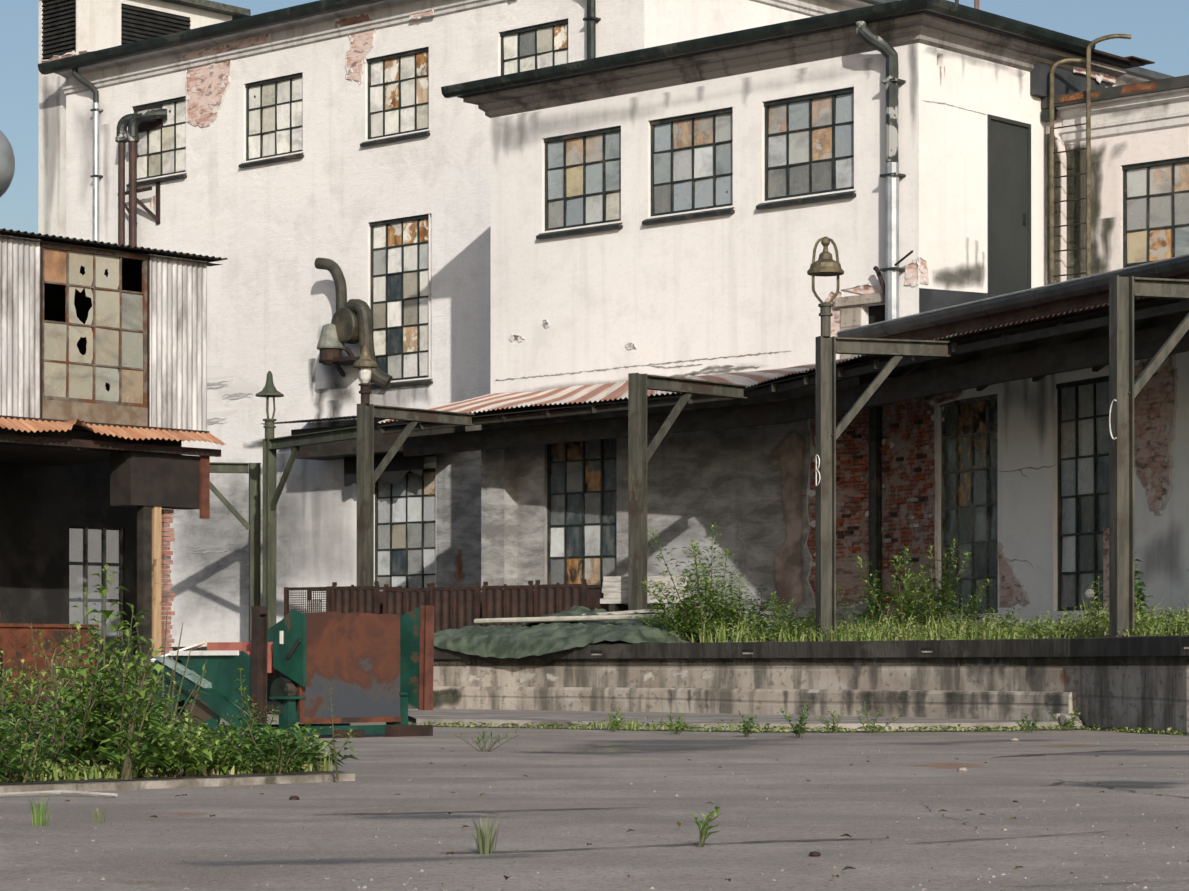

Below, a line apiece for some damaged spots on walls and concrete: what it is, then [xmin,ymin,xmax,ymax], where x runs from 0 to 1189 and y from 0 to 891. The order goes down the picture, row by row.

peeling [183,34,268,128]
peeling [335,14,377,85]
corrosion [1061,92,1097,102]
water stain [1046,134,1079,254]
water stain [1092,162,1113,259]
peeling [825,283,883,337]
peeling [1134,354,1178,516]
flaking render [805,418,816,606]
flaking render [836,390,966,624]
peeling [997,542,1030,608]